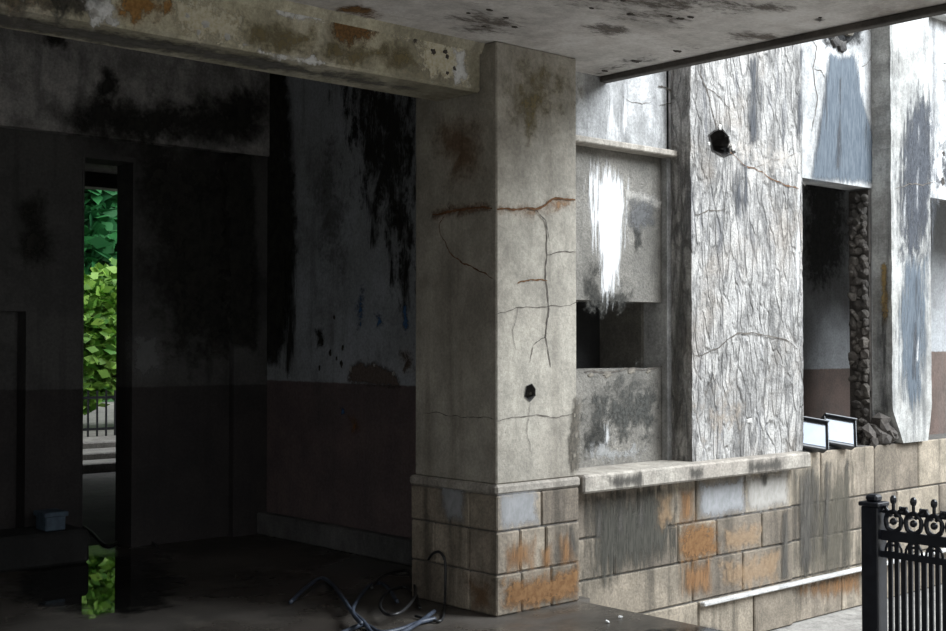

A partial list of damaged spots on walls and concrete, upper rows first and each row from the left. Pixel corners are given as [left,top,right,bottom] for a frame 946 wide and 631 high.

corrosion [116,0,172,25]
corrosion [325,5,388,66]
crack [812,41,825,129]
peeling [829,36,849,53]
leakage [0,0,416,373]
hole [707,124,736,157]
leakage [803,31,872,289]
crack [433,197,578,367]
leakage [584,167,675,316]
leakage [895,80,946,414]
crack [695,332,797,394]
corrosion [503,539,579,608]